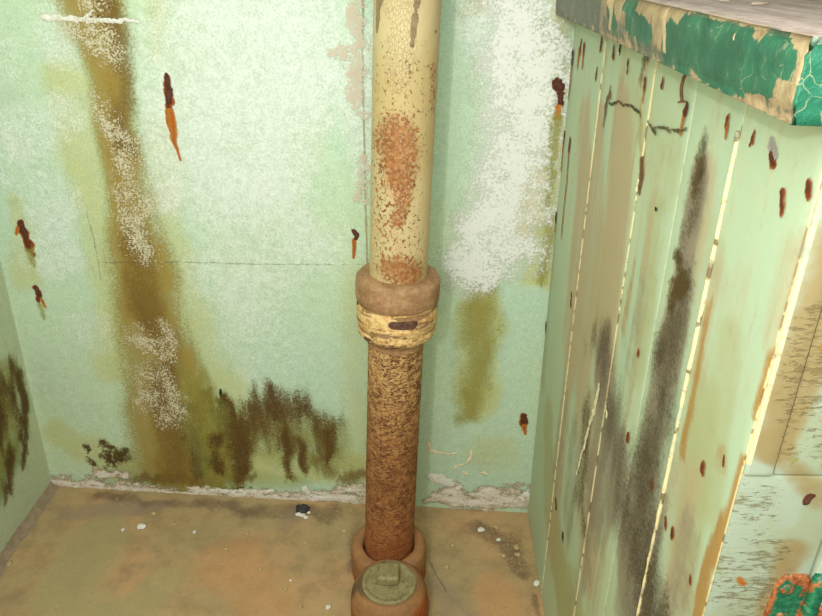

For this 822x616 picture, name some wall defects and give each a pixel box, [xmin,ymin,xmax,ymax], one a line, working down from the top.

rust [15,219,36,267]
rust [32,285,46,319]
rust [163,73,181,161]
leakage [51,0,345,492]
peeling [327,0,372,120]
leakage [438,0,574,421]
rust [551,39,585,234]
crack [603,85,687,136]
leakage [683,136,706,234]
leakage [0,355,30,505]
rust [519,413,528,435]
leakage [614,247,693,616]